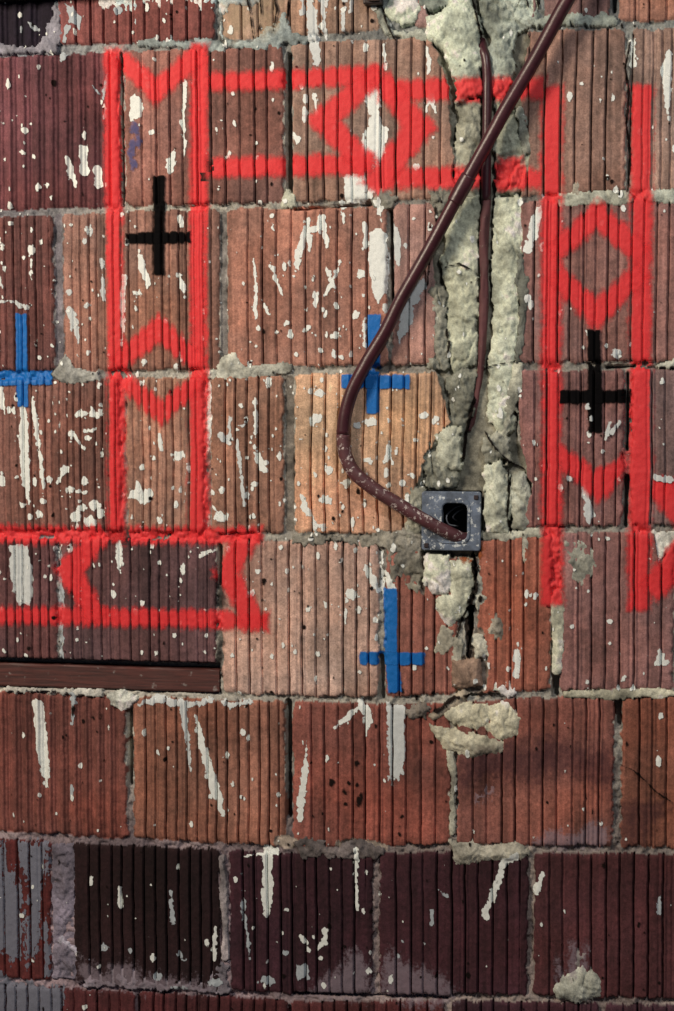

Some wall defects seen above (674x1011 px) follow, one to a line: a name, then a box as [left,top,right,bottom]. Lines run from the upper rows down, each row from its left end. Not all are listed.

crack [456,557,478,659]
crack [421,691,503,718]